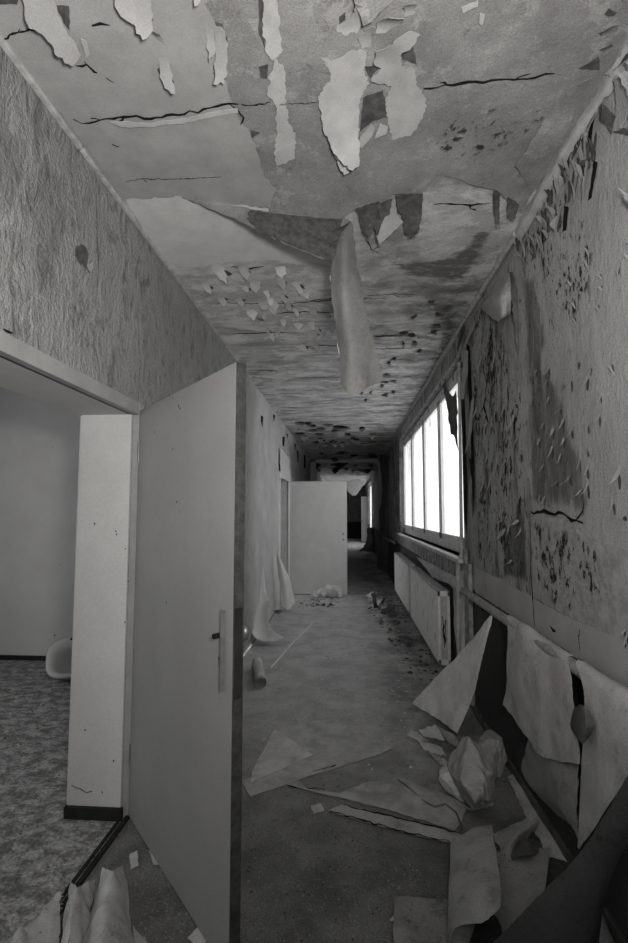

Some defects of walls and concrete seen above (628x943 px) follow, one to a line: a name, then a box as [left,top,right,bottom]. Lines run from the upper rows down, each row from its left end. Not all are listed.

crack [73,101,319,147]
peeling [0,0,628,354]
crack [423,73,555,90]
peeling [282,422,400,532]
crack [529,501,584,649]